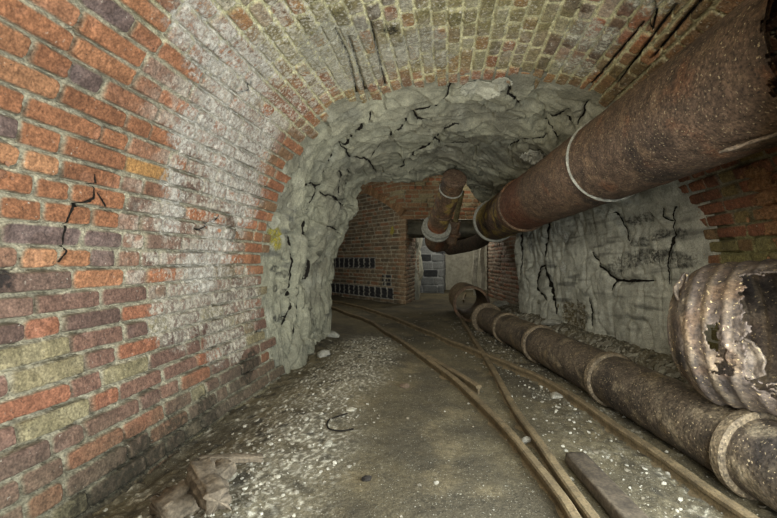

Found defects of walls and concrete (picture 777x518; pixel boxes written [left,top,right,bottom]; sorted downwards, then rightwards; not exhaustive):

crack [335,28,366,92]
crack [370,21,385,83]
crack [507,83,519,103]
crack [400,122,479,167]
crack [57,174,108,262]
crack [281,83,451,334]
crack [520,223,558,314]
crack [592,206,677,290]